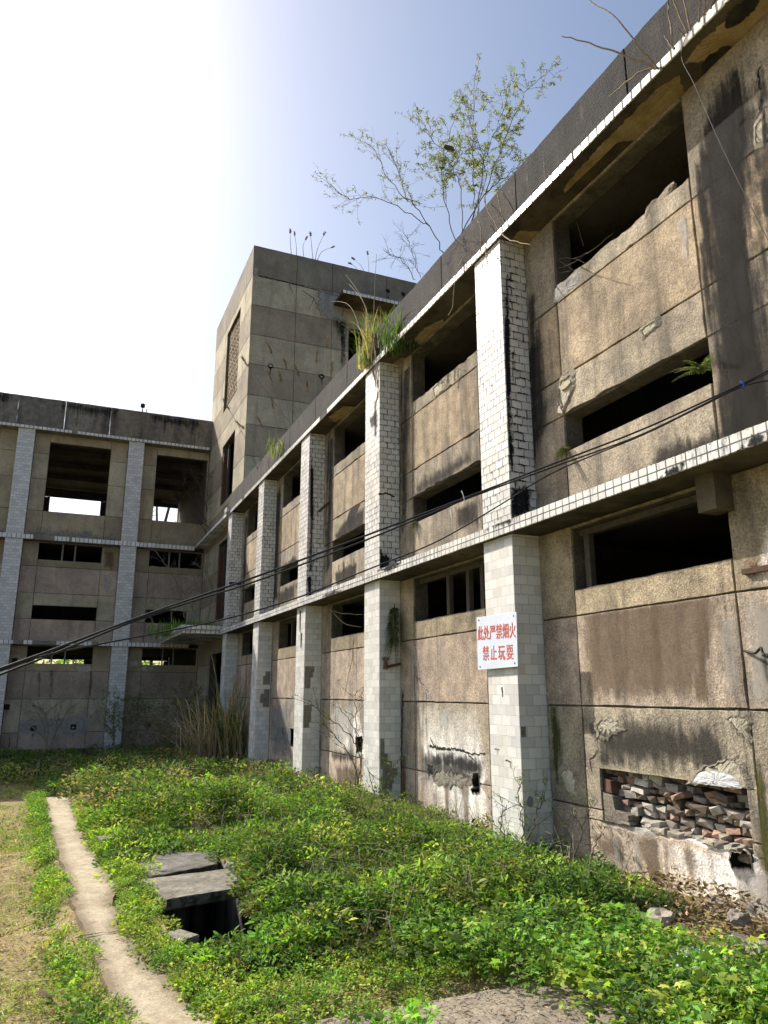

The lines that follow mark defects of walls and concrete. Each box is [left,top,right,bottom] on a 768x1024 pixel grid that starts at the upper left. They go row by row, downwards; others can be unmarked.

damp [655,69,768,478]
damp [450,257,549,530]
damp [152,416,198,433]
peeling [260,671,270,707]
peeling [305,666,315,688]
peeling [304,705,312,728]
peeling [380,739,398,797]
crack [400,676,431,798]
damp [423,754,481,822]
crack [429,738,511,767]
spalling [603,792,640,826]
damp [590,722,724,771]